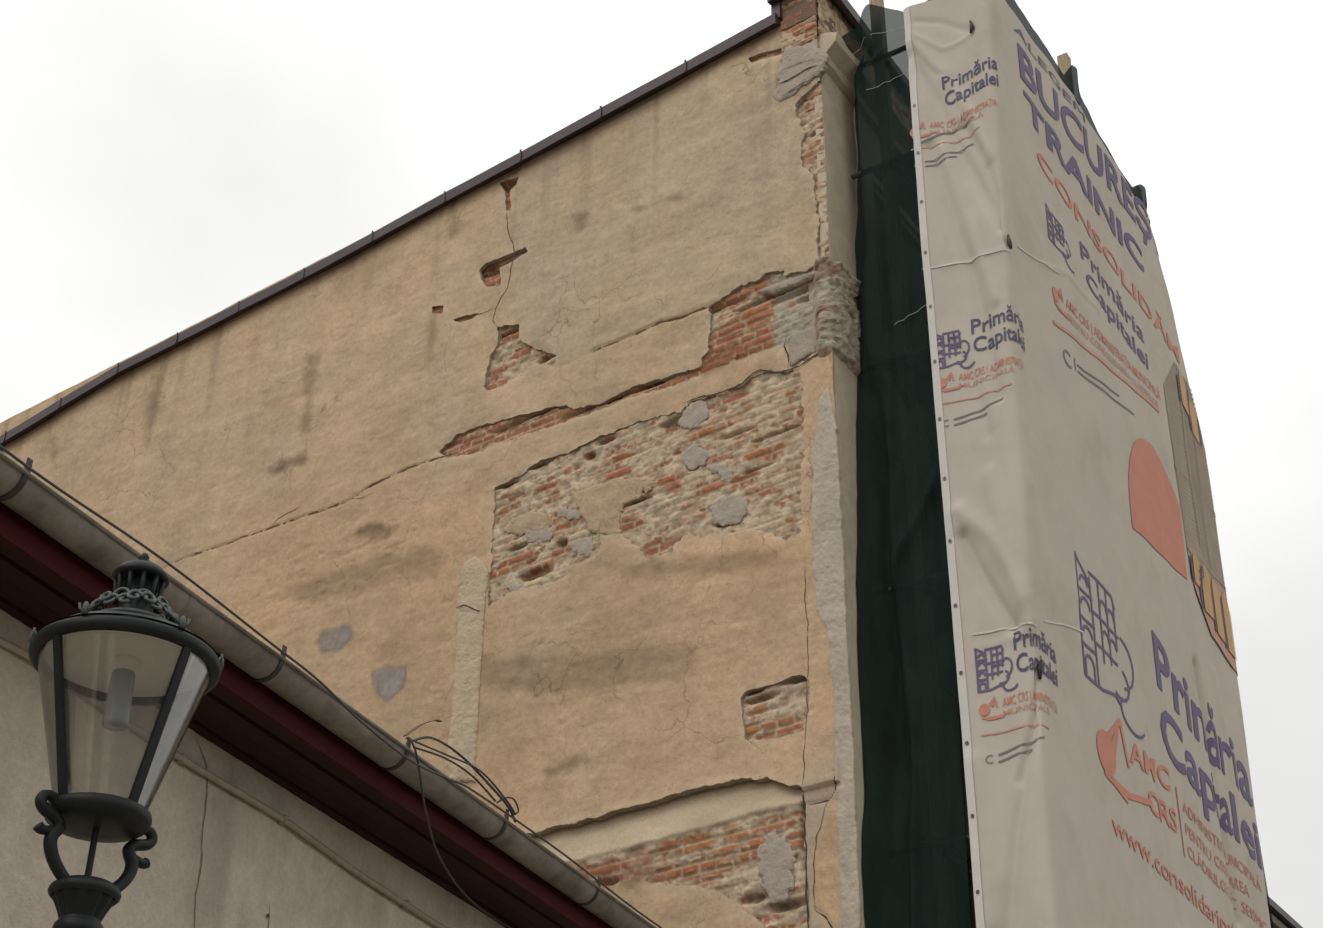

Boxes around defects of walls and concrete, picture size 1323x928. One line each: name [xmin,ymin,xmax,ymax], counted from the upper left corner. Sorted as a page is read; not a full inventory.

crack [471,214,515,327]
spalling [442,80,829,604]
crack [163,452,459,568]
spalling [743,677,810,744]
spalling [532,780,810,928]